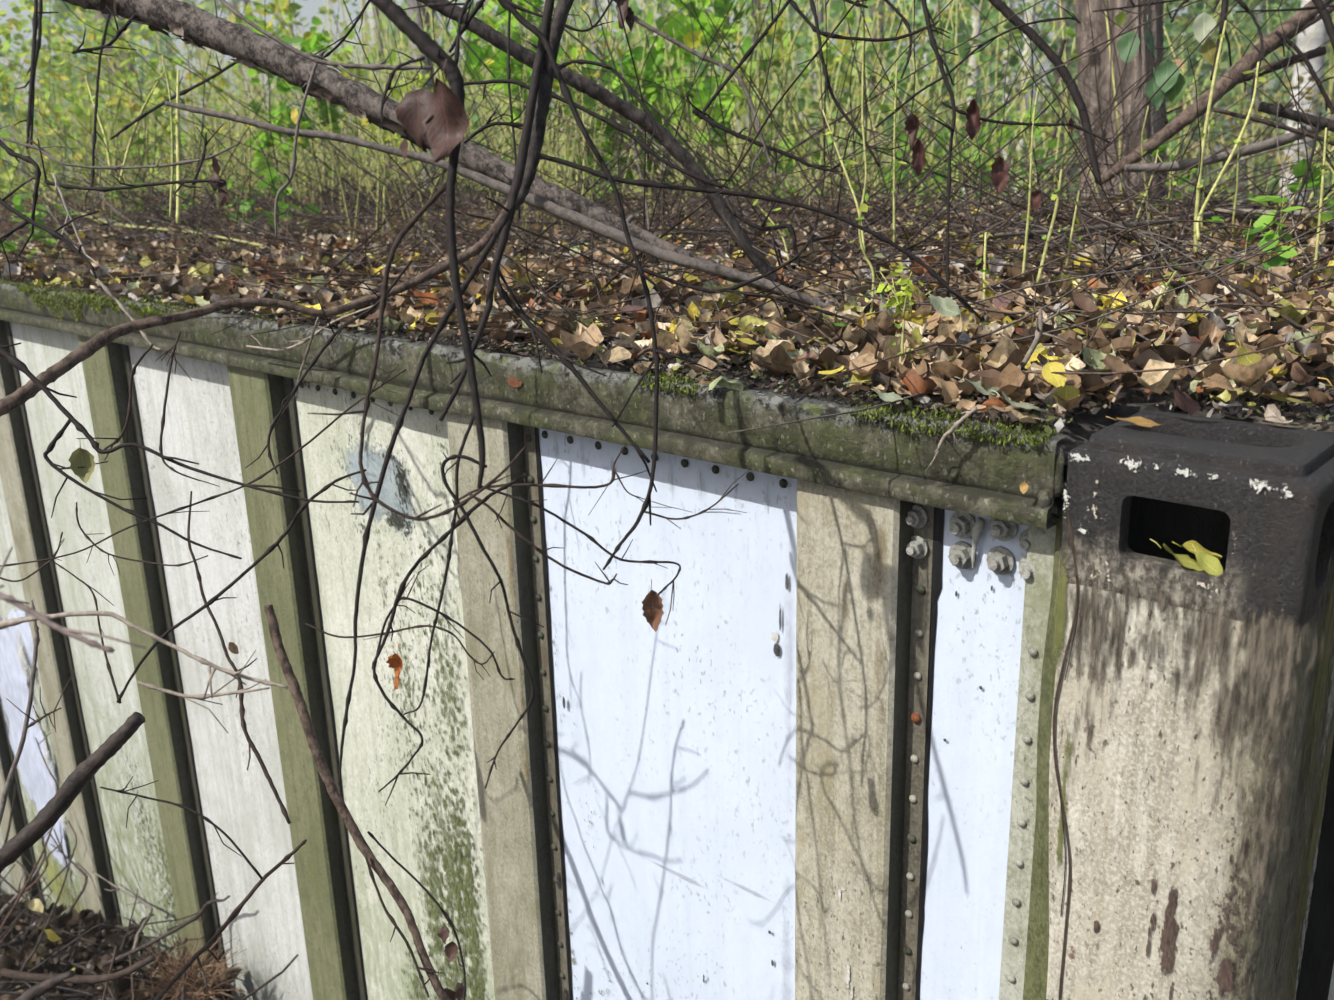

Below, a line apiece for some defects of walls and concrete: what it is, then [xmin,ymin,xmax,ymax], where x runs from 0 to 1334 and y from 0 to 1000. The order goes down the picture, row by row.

water stain [372,525,489,1000]
water stain [1069,550,1334,1000]